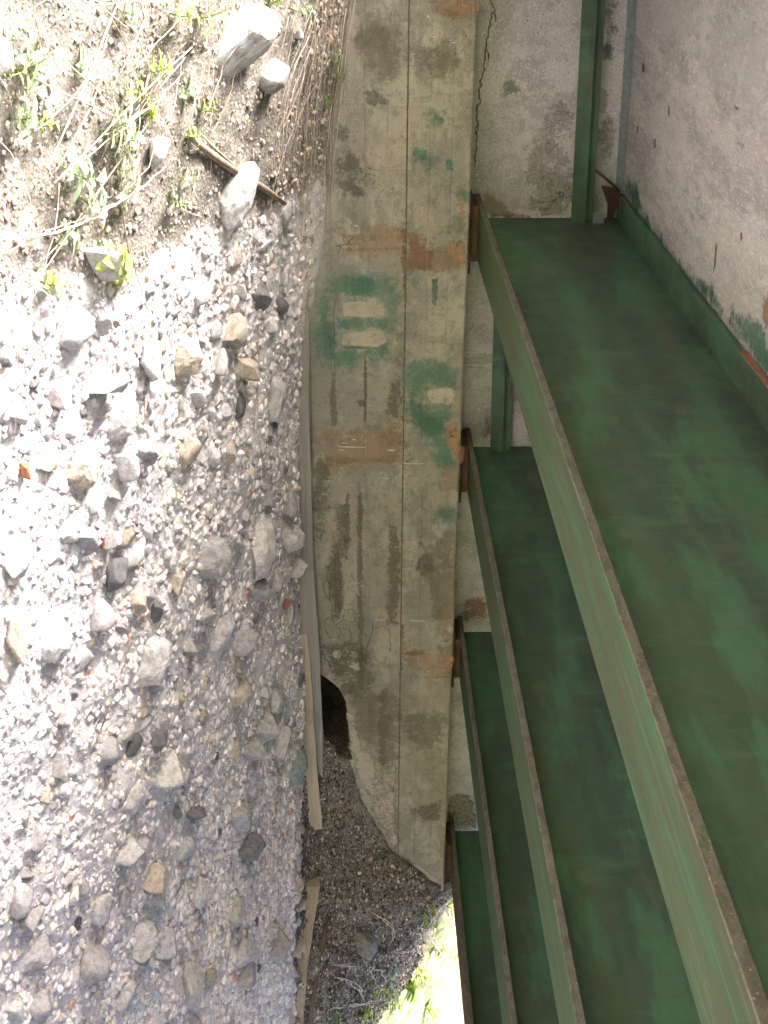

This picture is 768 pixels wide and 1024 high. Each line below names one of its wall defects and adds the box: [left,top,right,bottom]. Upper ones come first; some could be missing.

crack [474,0,497,167]
corrosion [386,193,468,295]
corrosion [740,351,768,388]
leakage [313,458,364,689]
crack [321,565,391,678]
leakage [386,525,424,629]